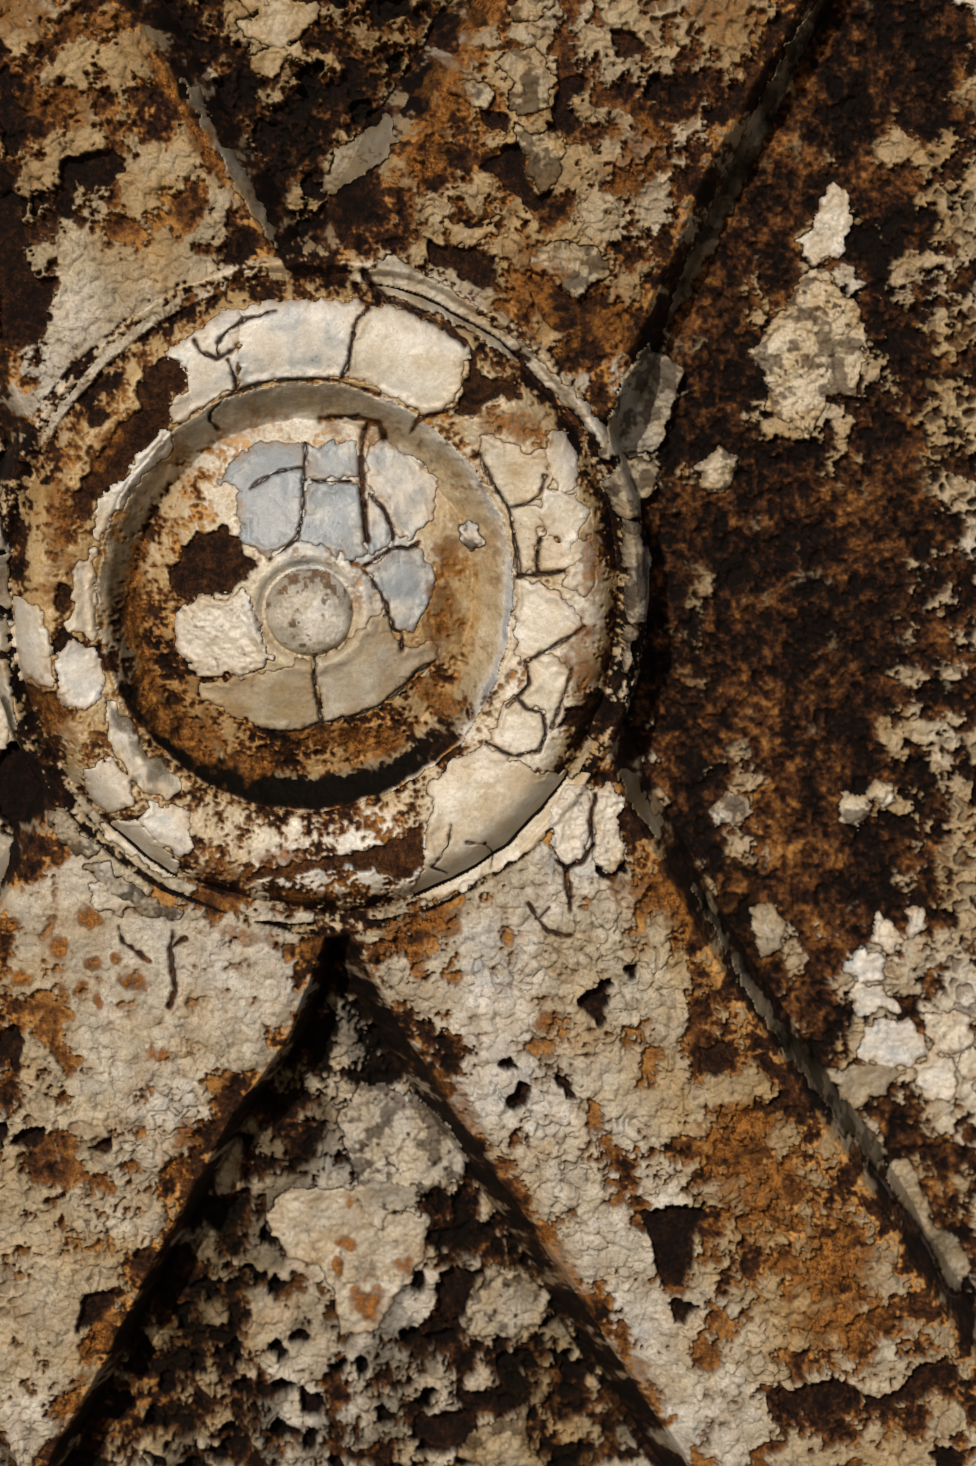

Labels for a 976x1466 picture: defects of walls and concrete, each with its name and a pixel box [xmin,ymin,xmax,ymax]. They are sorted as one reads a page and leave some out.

peeling [748,182,868,440]
corrosion [125,539,274,780]
crack [197,274,461,733]
peeling [0,198,684,920]
crack [479,455,563,578]
crack [488,628,582,756]
crack [530,801,595,936]
corrosion [611,879,691,937]
corrosion [332,1237,384,1322]
peeling [265,1081,470,1335]
corrosion [693,1101,909,1353]
peeling [690,882,976,1294]